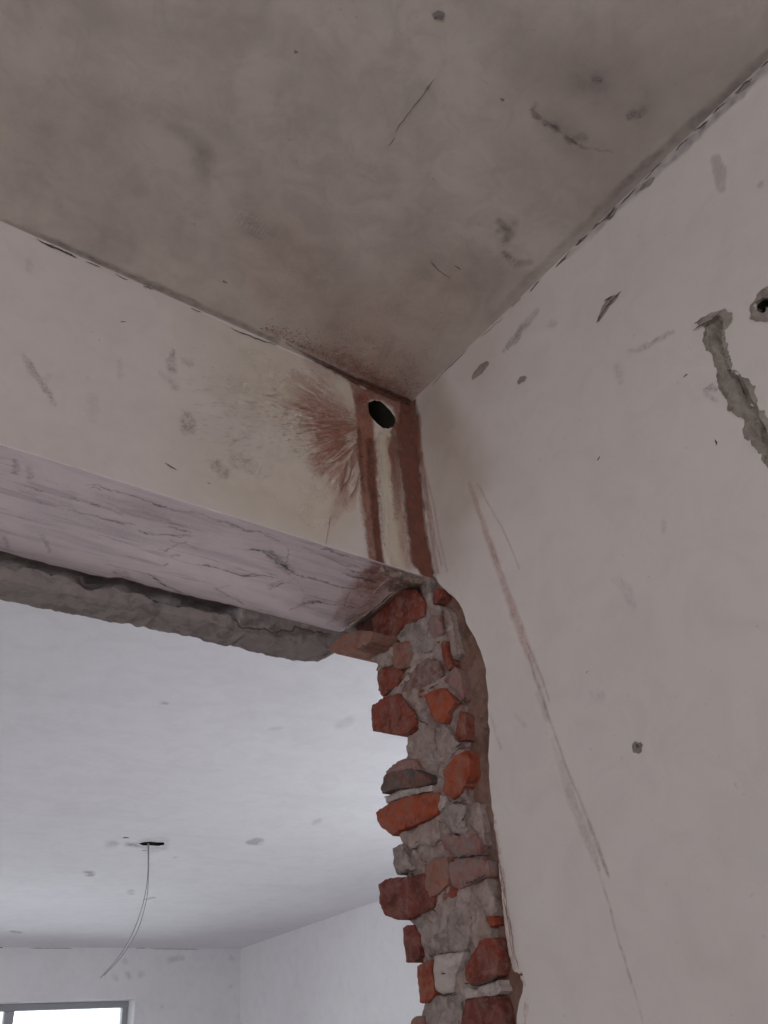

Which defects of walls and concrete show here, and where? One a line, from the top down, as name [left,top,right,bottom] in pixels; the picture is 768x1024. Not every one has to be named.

corrosion [267,355,434,630]
spalling [0,551,529,1024]